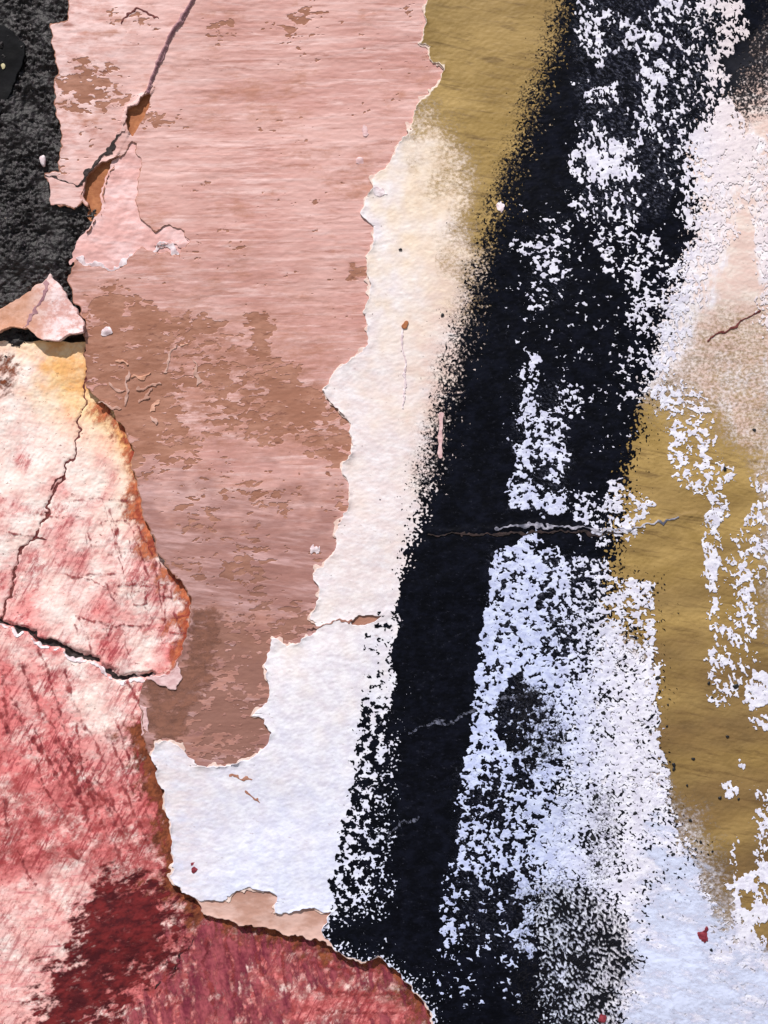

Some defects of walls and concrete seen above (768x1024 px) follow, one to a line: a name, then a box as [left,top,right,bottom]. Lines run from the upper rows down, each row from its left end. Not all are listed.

crack [45,0,195,187]
crack [0,347,153,686]
spalling [0,0,445,1024]
crack [428,516,679,538]